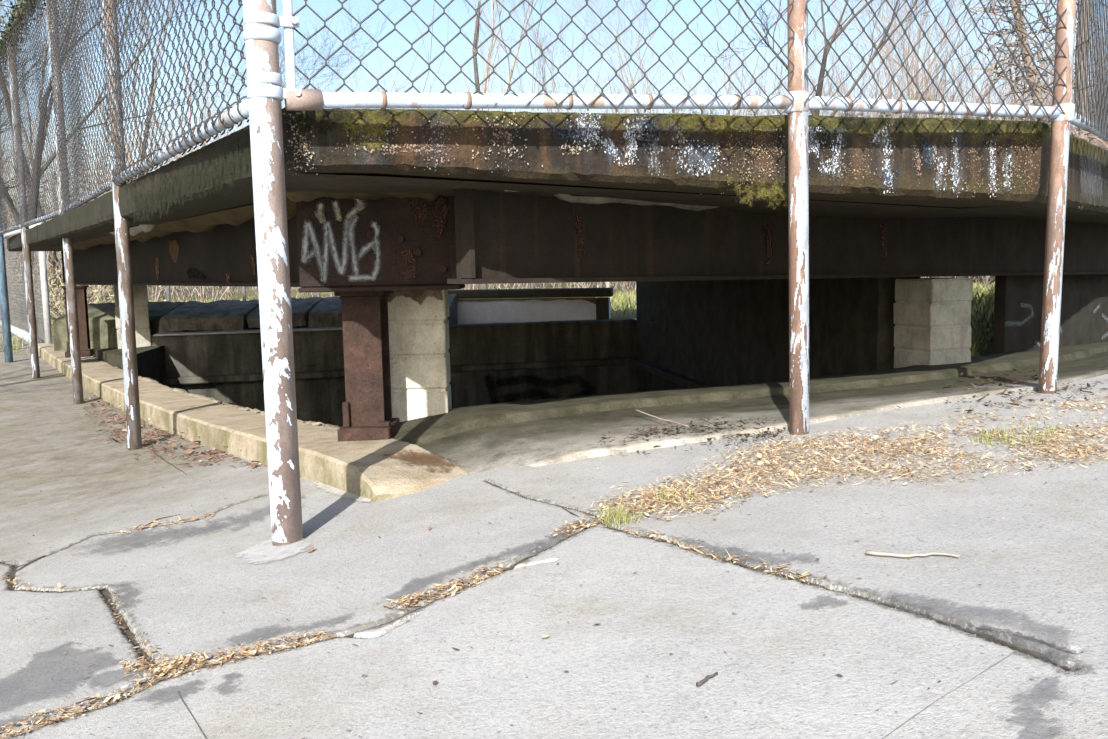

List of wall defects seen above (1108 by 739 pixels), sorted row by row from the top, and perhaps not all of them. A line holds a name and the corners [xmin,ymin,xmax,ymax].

water stain [283,112,322,170]
water stain [332,112,458,175]
water stain [472,110,546,171]
peeling [53,0,440,542]
crack [0,495,265,739]
crack [235,481,1078,739]